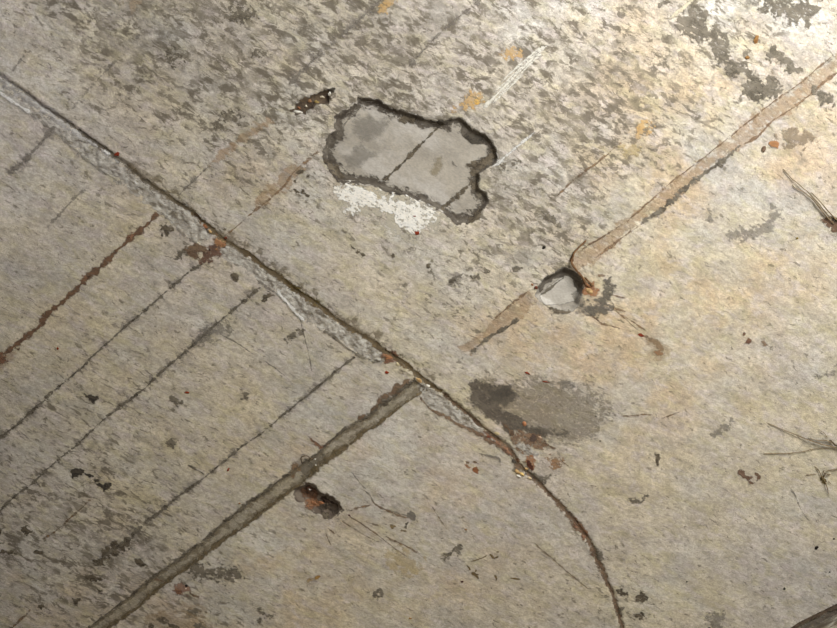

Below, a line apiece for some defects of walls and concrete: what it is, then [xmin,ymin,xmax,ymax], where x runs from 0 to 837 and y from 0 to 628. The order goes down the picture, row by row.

spalling [290,87,336,115]
spalling [322,97,499,225]
water stain [333,180,454,245]
rust [0,212,159,364]
crack [588,295,645,332]
crack [0,72,625,628]
water stain [468,379,569,438]